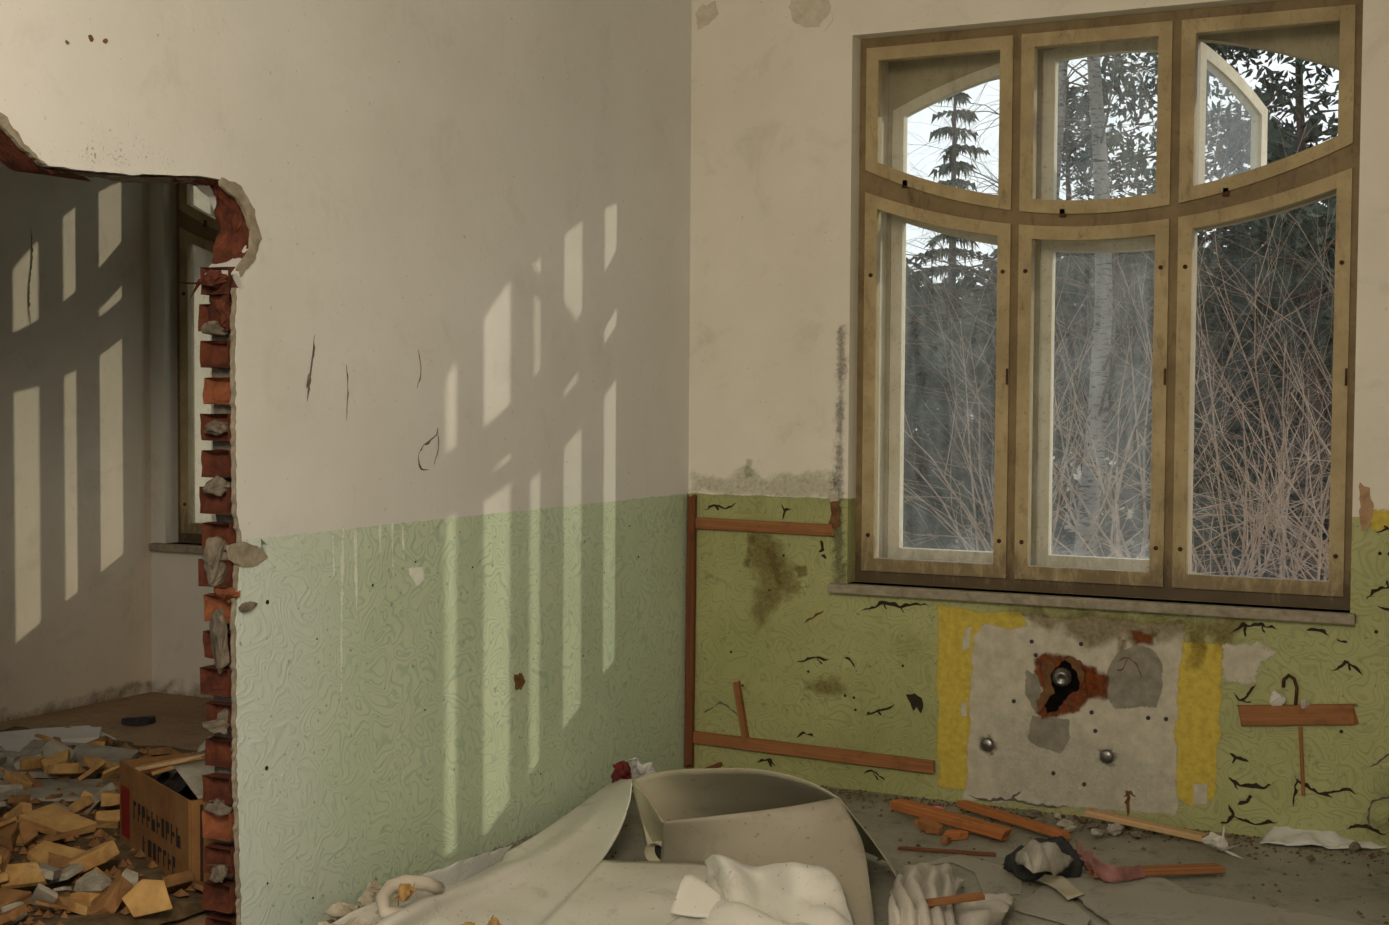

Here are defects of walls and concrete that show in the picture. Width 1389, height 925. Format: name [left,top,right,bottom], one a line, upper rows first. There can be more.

spalling [0,112,268,925]
flaking render [961,610,1208,816]